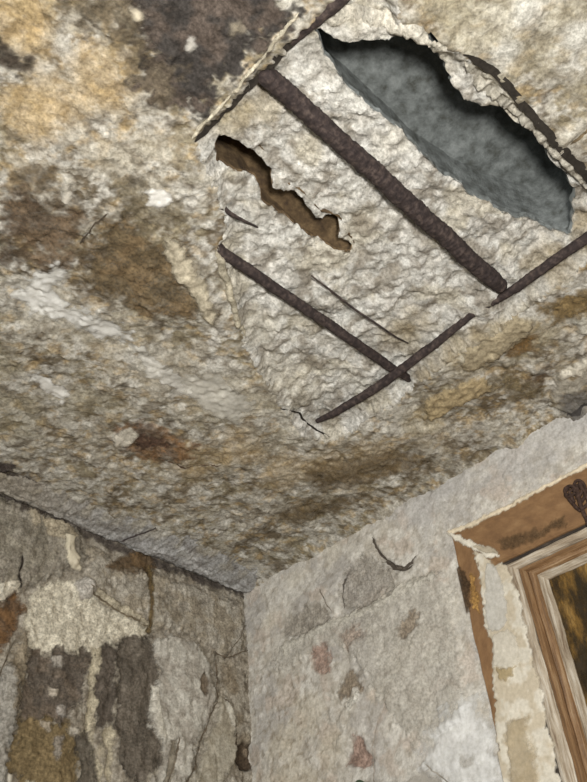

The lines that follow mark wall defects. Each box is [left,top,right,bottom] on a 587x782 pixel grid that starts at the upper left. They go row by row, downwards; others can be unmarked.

leakage [0,37,35,77]
leakage [59,0,306,119]
spalling [192,0,587,443]
flaking render [164,238,216,325]
rust [508,334,535,357]
rust [538,289,587,325]
crack [567,404,587,417]
crack [17,555,25,587]
crack [91,555,153,633]
crack [168,625,248,782]